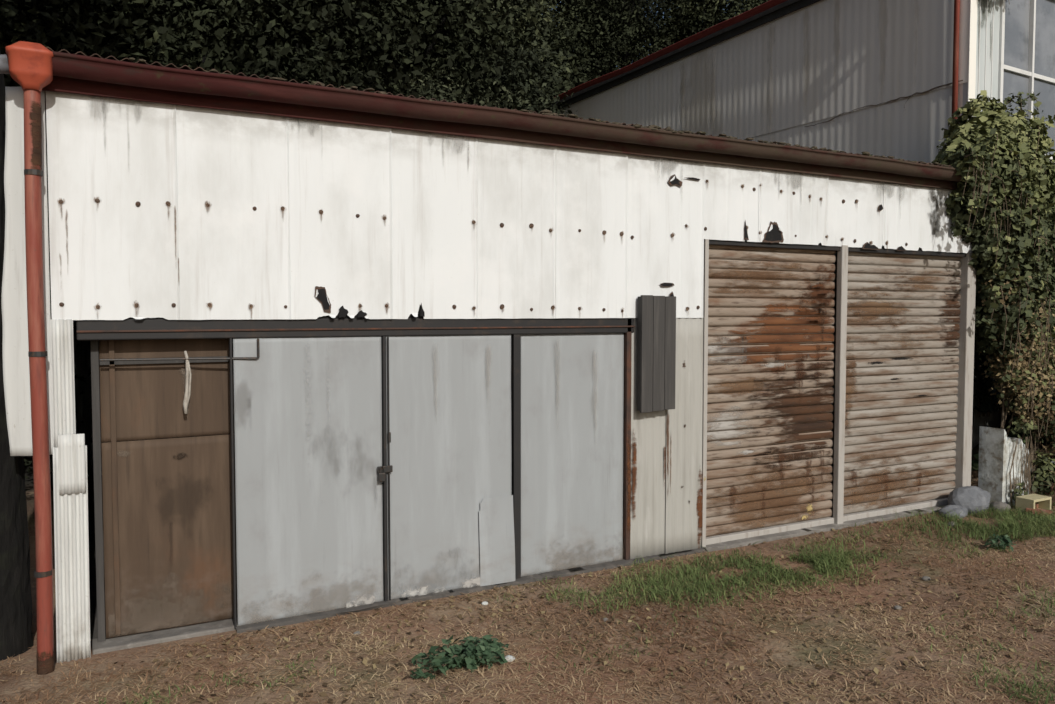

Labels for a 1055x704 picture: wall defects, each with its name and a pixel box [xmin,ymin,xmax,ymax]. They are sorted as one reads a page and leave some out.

rust [746,222,784,243]
peeling [316,290,369,319]
rust [847,287,922,347]
rust [896,265,961,359]
rust [689,257,856,544]
rust [627,438,637,531]
rust [664,414,683,488]
rust [844,455,941,509]